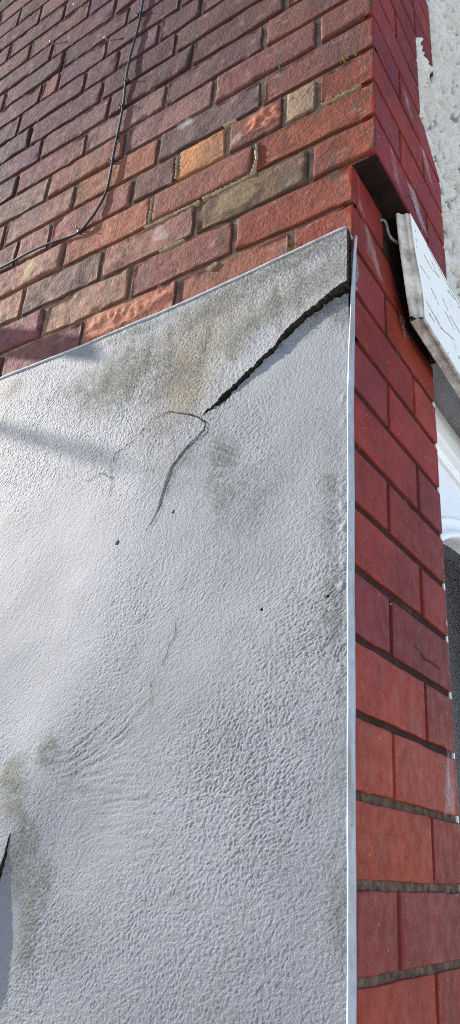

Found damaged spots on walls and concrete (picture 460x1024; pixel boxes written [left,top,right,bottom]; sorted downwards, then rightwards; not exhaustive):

water stain [181,233,343,348]
water stain [74,325,188,407]
crack [85,388,237,530]
water stain [4,792,49,966]